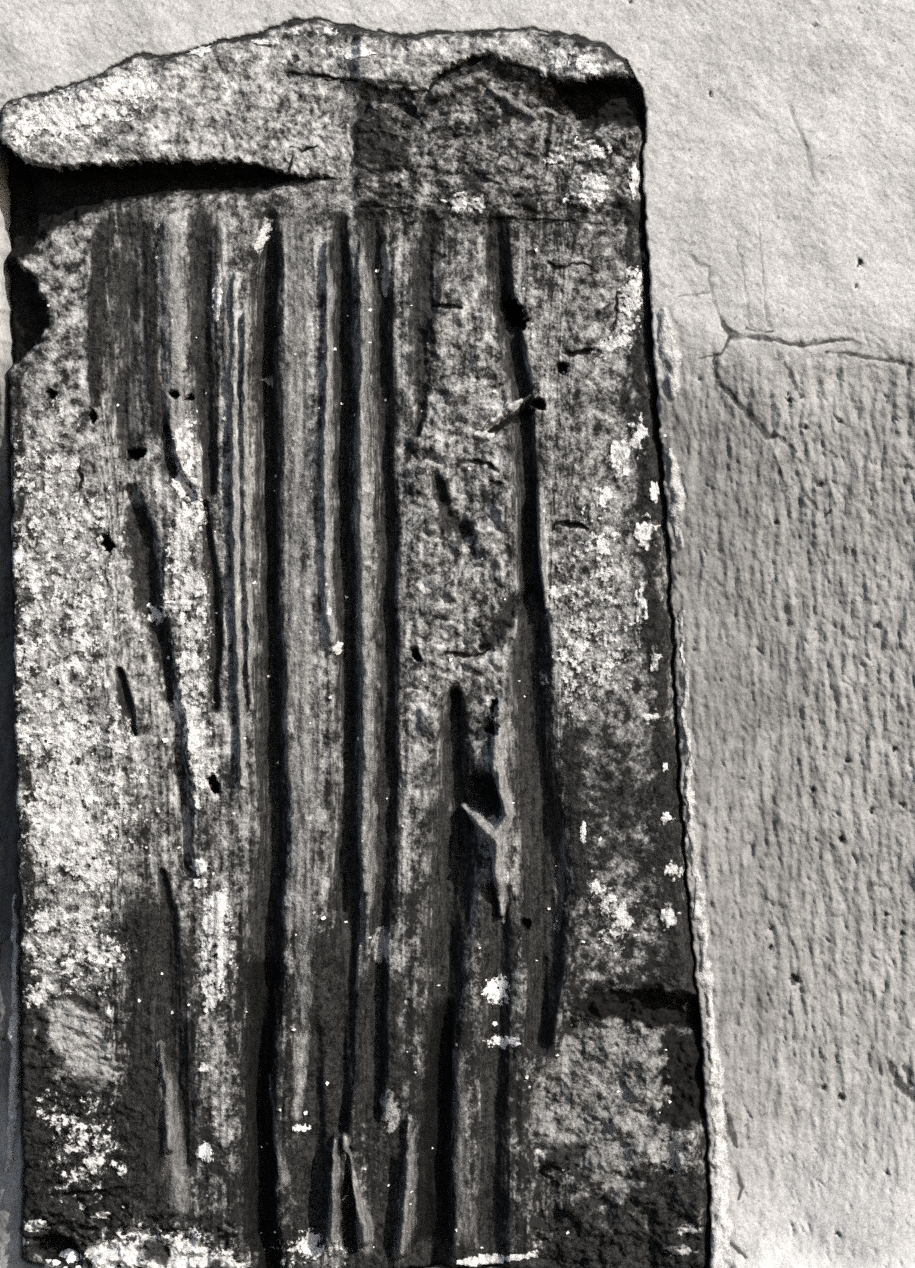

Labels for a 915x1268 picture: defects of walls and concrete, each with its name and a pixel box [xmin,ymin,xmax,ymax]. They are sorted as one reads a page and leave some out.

leakage [9,379,198,1262]
leakage [88,196,225,712]
spalling [6,145,327,369]
leakage [238,93,711,1268]
crack [698,316,915,517]